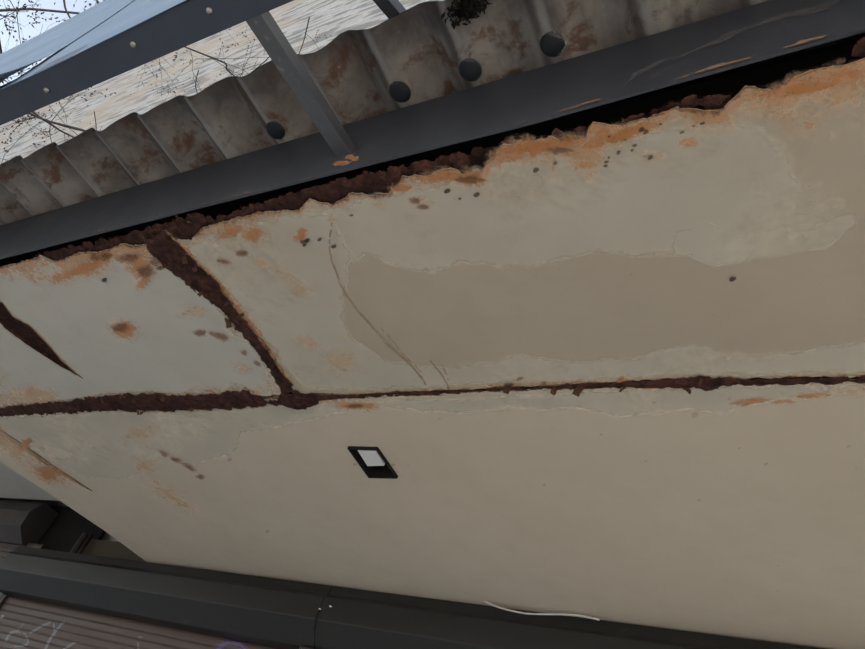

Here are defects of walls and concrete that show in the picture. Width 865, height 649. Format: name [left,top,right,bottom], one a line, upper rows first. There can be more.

corrosion [0,35,865,383]
peeling [184,122,865,415]
crack [0,301,82,378]
corrosion [735,394,829,407]
crack [0,429,92,491]
peeling [0,402,333,479]